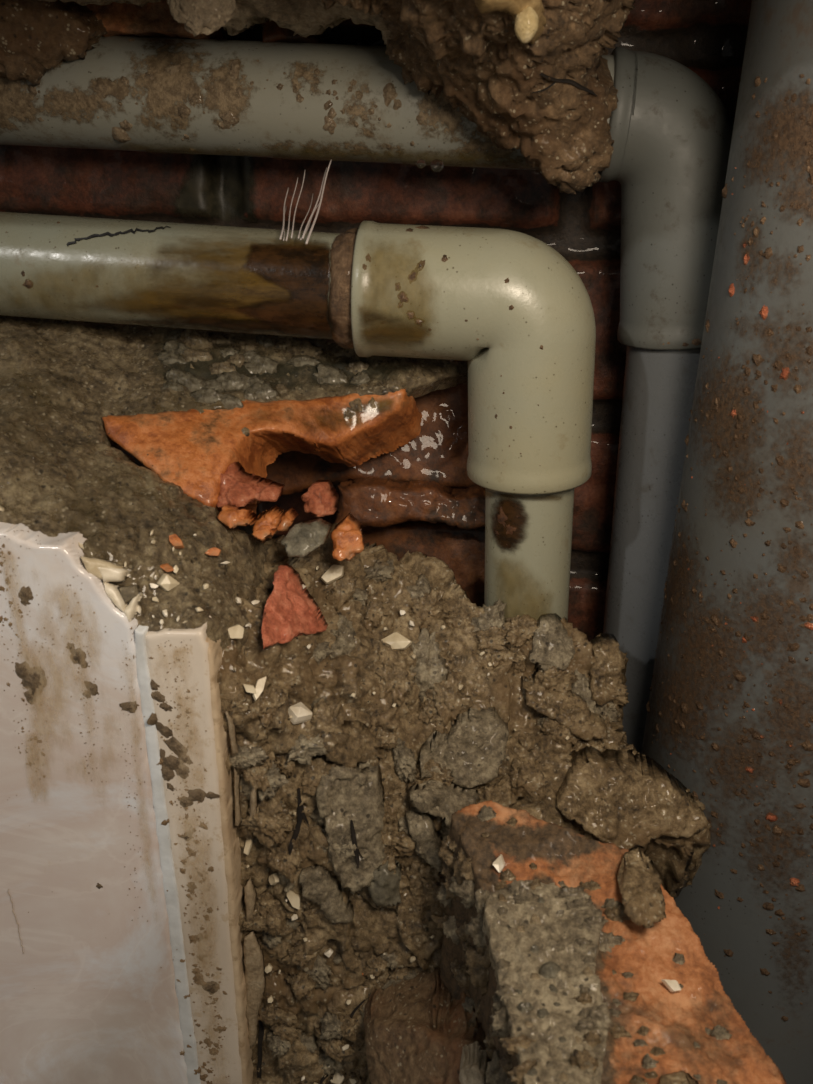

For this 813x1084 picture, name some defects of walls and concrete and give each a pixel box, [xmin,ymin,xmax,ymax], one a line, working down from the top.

flaking render [86,0,227,40]
corrosion [115,239,336,339]
spalling [102,389,422,513]
corrosion [485,491,527,550]
spalling [78,534,197,625]
peeling [321,565,344,585]
peeling [228,623,251,639]
peeling [243,676,266,701]
peeling [288,702,312,724]
peeling [493,854,505,873]
peeling [269,873,300,909]
peeling [243,878,266,1049]